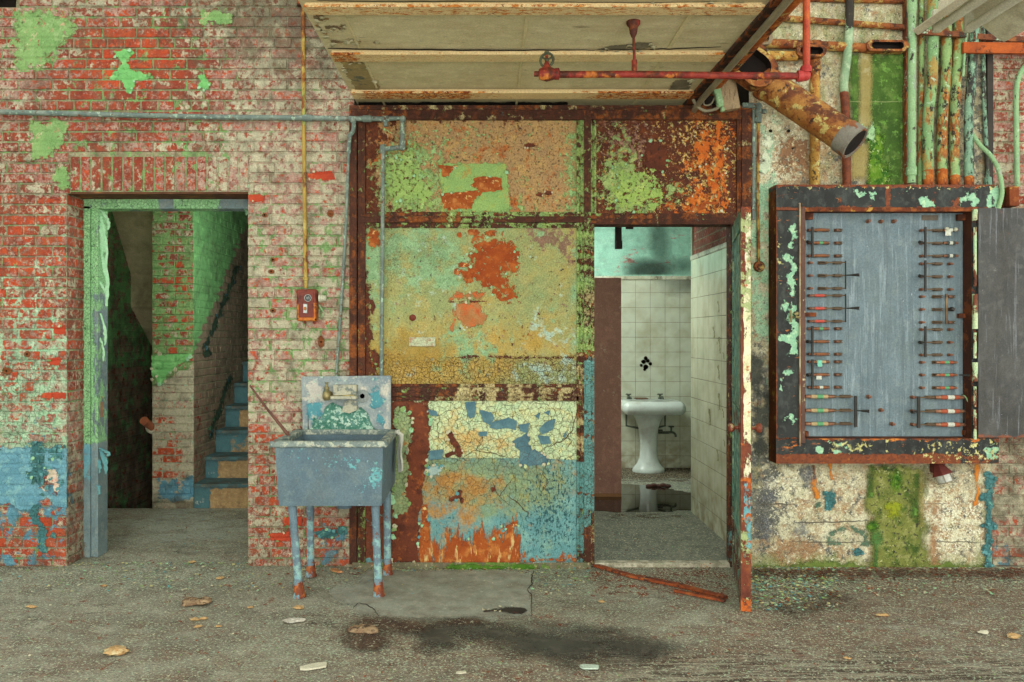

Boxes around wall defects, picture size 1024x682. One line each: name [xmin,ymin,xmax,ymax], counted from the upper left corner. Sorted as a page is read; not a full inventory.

peeling [9,8,78,72]
peeling [109,48,153,94]
peeling [379,143,512,215]
rust [641,139,671,174]
rust [686,121,730,213]
rust [454,228,521,305]
crack [387,354,597,517]
peeling [465,401,567,469]
peeling [0,441,67,553]
rust [810,465,820,499]
peeling [751,471,1024,610]
water stain [342,617,670,664]